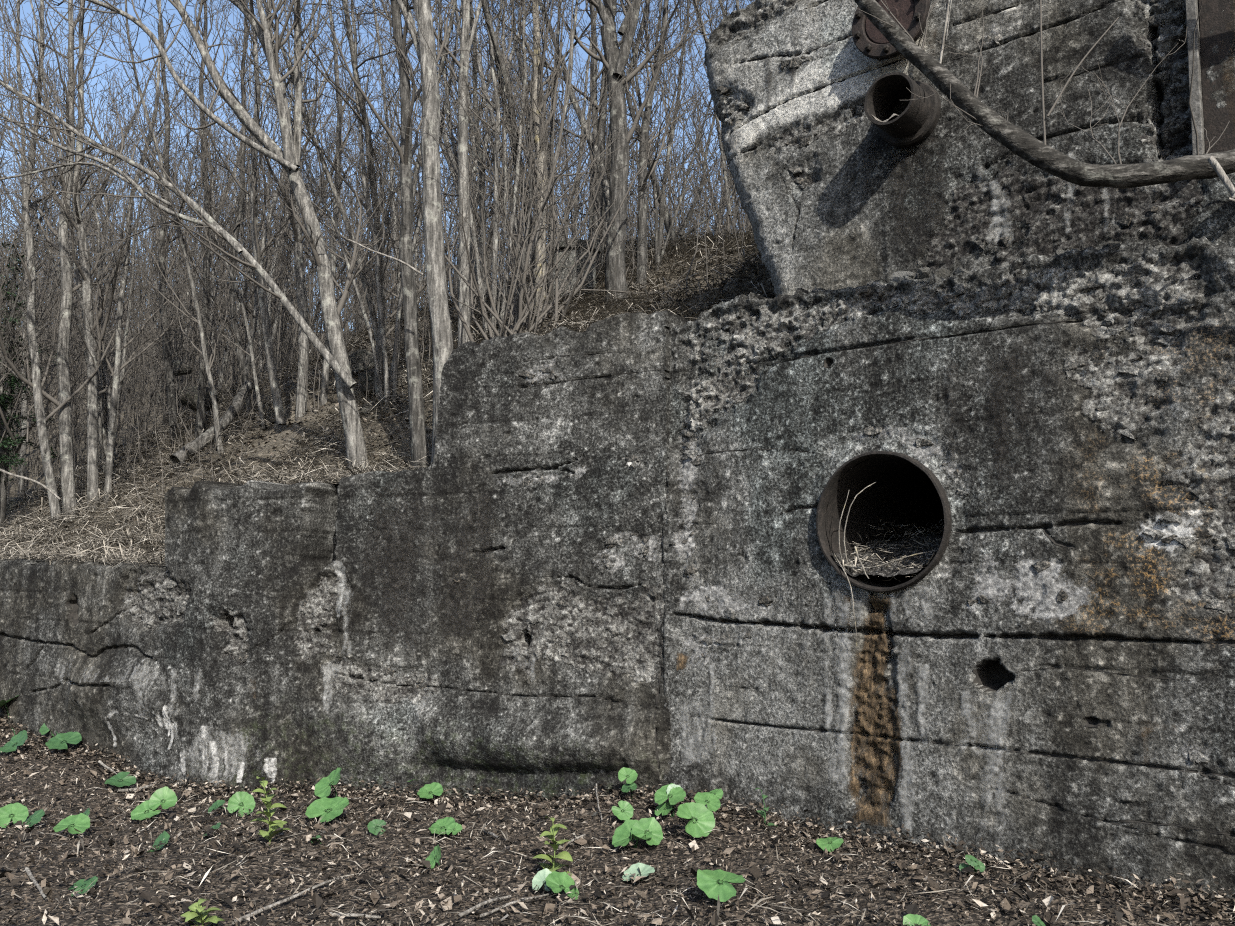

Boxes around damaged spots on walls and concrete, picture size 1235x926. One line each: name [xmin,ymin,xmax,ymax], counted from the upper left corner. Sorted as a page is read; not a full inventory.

spalling [498,162,1208,684]
spalling [1139,350,1235,619]
crack [3,610,153,692]
rust [850,593,903,825]